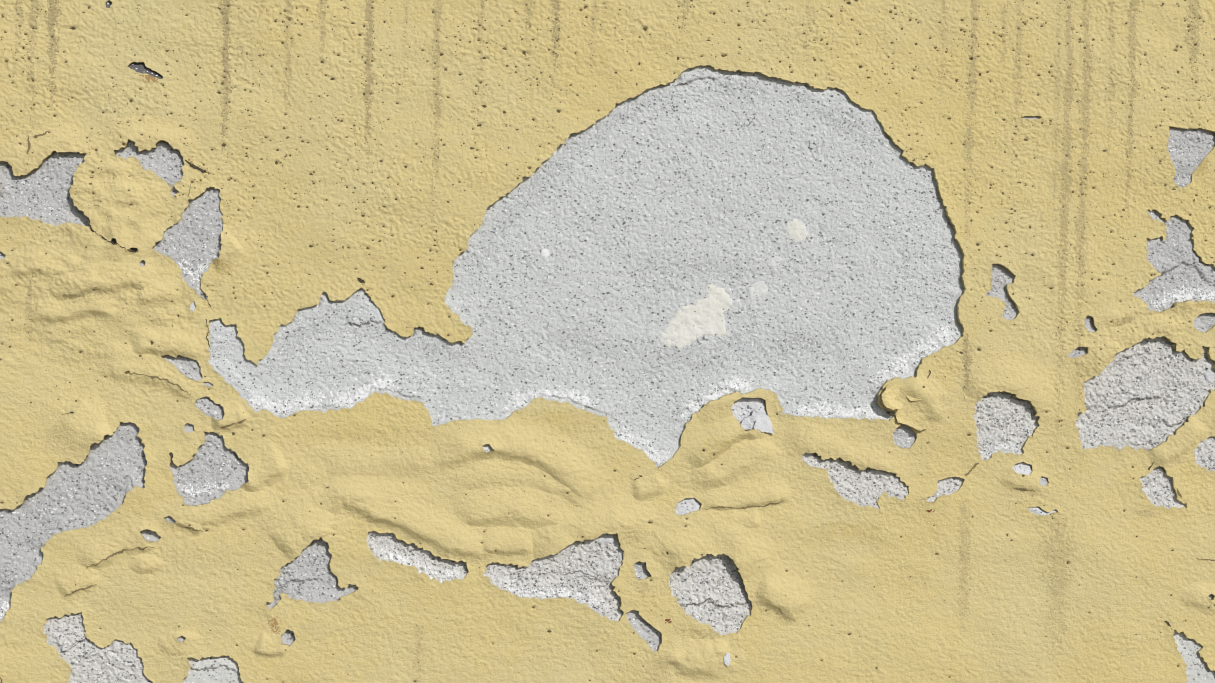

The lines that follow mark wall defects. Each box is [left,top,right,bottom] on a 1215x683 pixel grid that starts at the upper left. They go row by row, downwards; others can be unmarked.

spalling [0,151,90,227]
spalling [115,140,230,317]
spalling [162,55,981,509]
spalling [1076,210,1215,451]
spalling [967,391,1048,486]
spalling [0,422,147,622]
spalling [266,537,358,609]
spalling [366,531,468,583]
spalling [483,533,661,651]
spalling [666,552,751,635]
spalling [43,612,153,683]
spalling [182,655,244,683]